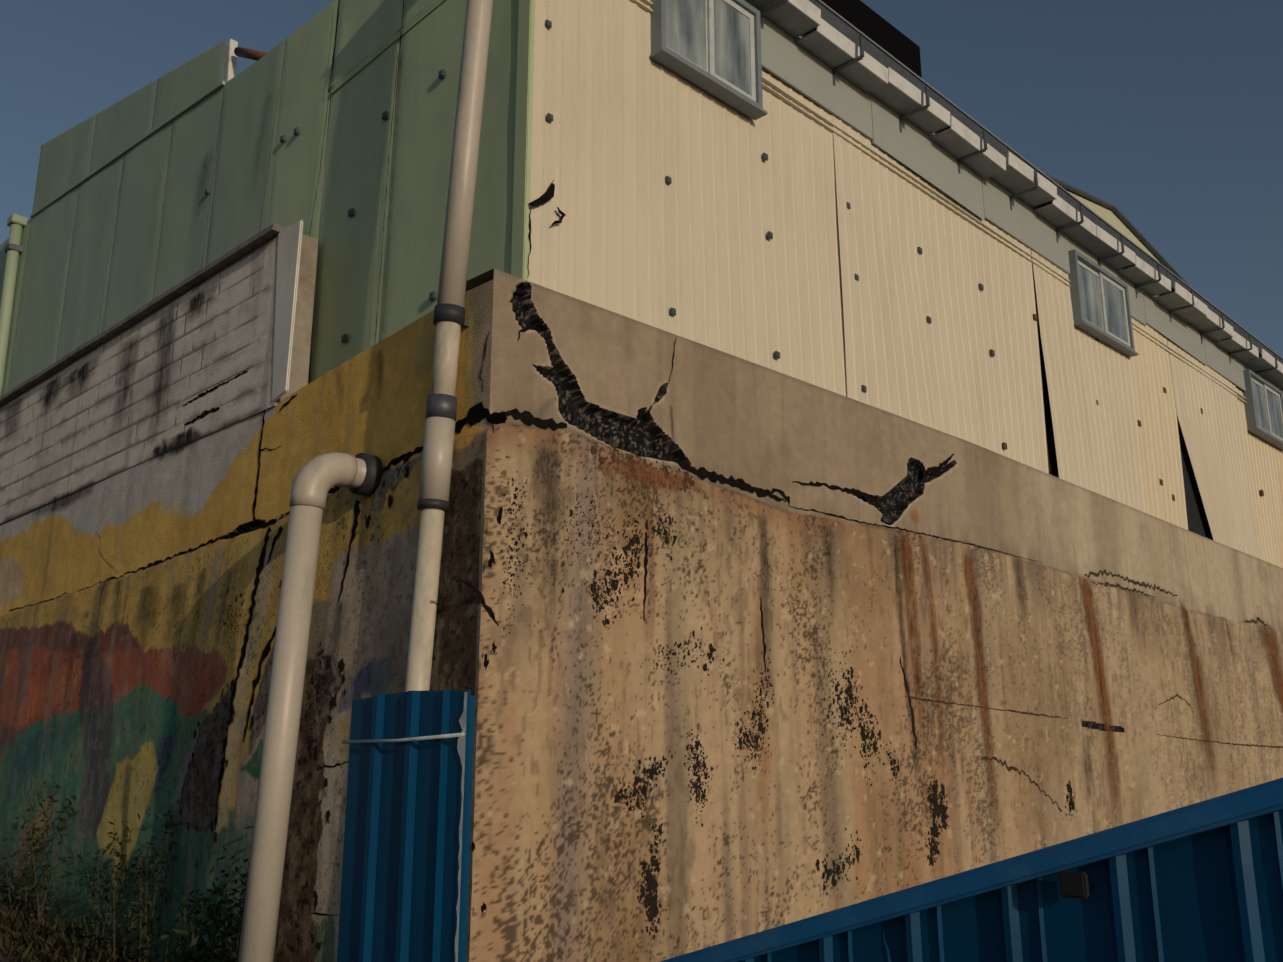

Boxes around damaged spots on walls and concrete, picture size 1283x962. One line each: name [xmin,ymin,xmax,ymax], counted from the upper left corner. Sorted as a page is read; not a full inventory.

damp [44,361,90,407]
damp [154,427,200,457]
crack [455,282,1042,563]
crack [9,394,297,825]
crack [328,486,360,602]
peeling [359,456,419,601]
crack [456,579,499,626]
damp [895,545,909,699]
corrosion [965,555,994,783]
corrosion [1082,580,1117,796]
corrosion [1182,606,1211,749]
peeling [274,631,346,962]